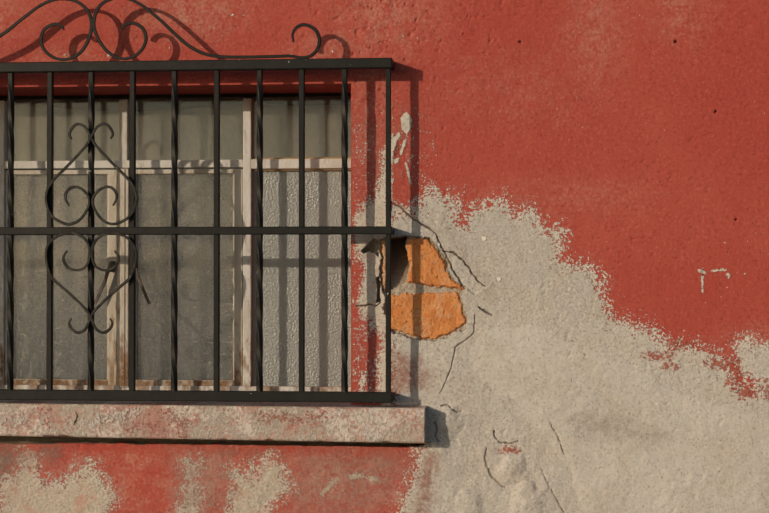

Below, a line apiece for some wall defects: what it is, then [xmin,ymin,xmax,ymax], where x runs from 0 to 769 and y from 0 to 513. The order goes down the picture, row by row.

crack [391,201,486,287]
crack [360,276,381,307]
peeling [352,112,769,513]
peeling [0,445,122,513]
peeling [169,445,302,513]
peeling [320,472,380,497]